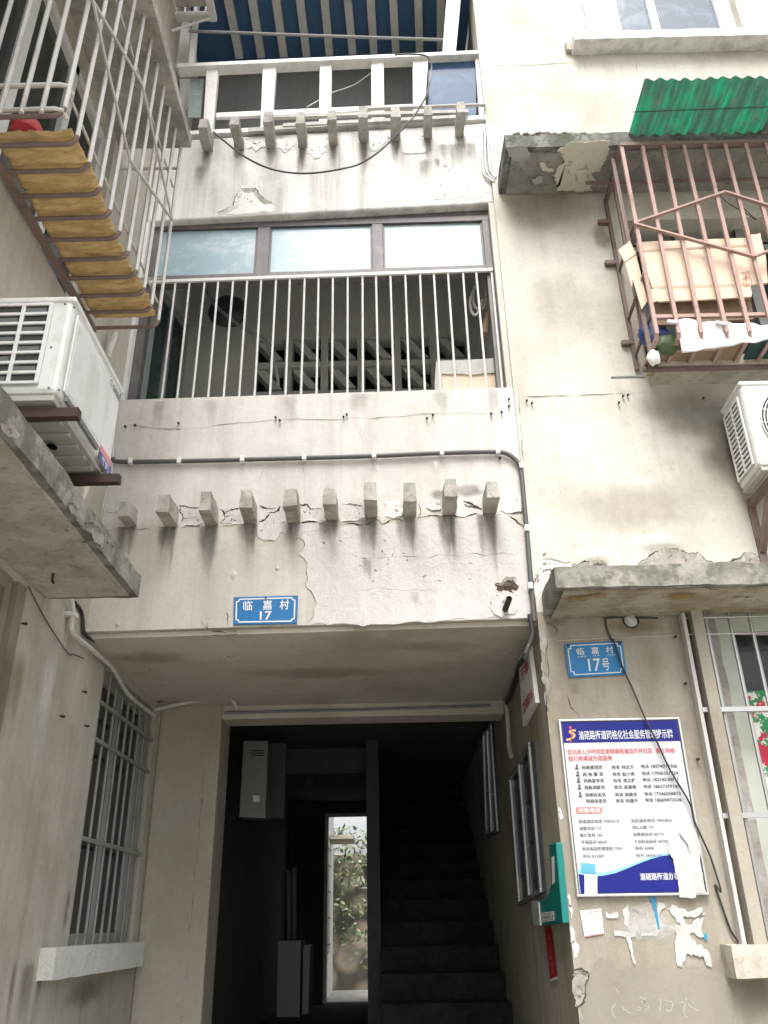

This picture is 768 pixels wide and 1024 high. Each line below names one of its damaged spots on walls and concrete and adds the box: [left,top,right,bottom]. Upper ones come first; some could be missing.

peeling [507,140,610,192]
spalling [217,185,275,215]
crack [179,501,524,528]
peeling [256,495,607,626]
spalling [637,547,714,565]
spalling [731,552,760,563]